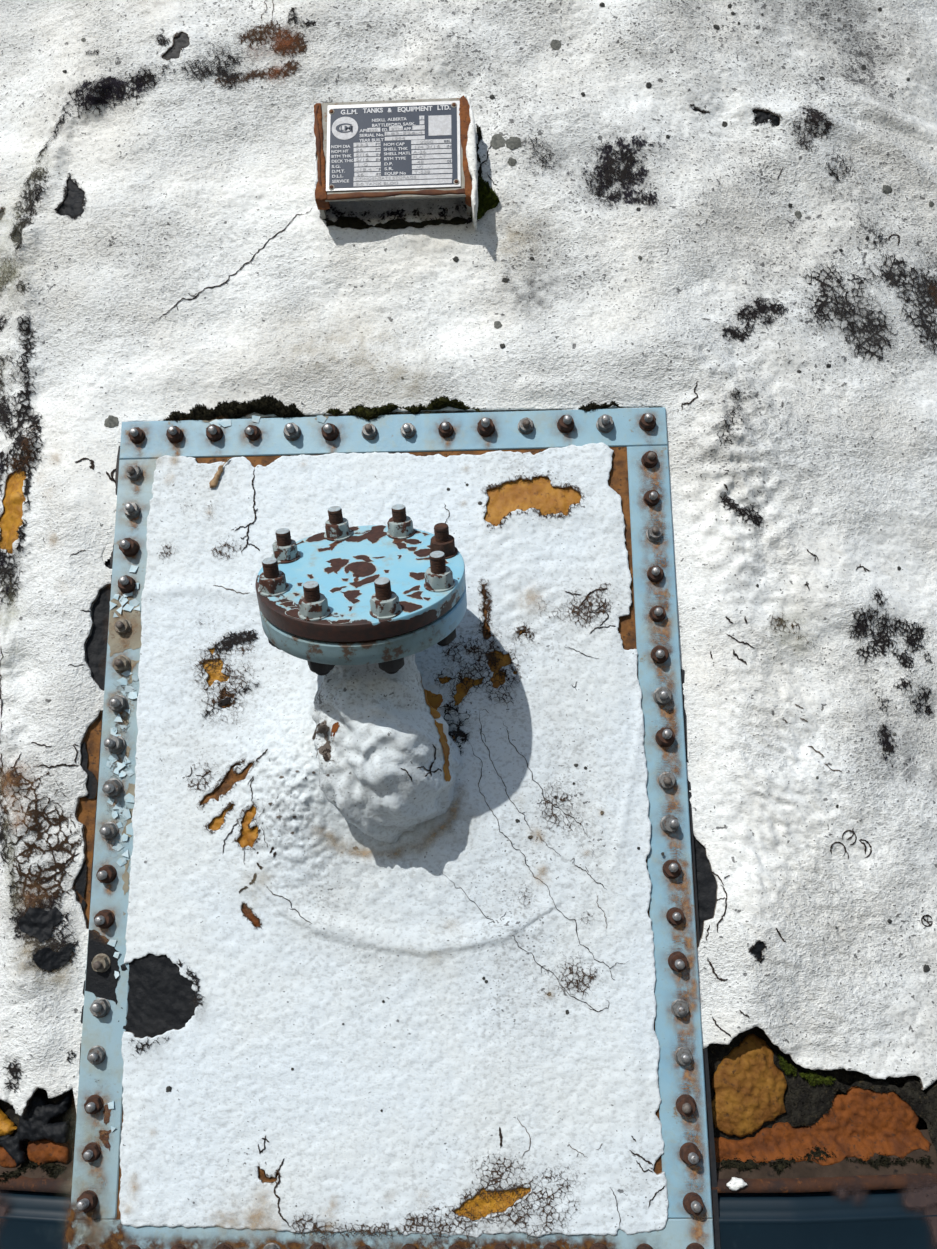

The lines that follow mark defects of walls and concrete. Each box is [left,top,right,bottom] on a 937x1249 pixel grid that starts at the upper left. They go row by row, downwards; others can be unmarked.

crack [0,0,316,607]
peeling [482,474,585,529]
peeling [279,720,339,779]
peeling [196,759,297,851]
peeling [19,907,198,1038]
rust [663,831,696,1093]
rust [65,1204,615,1249]
peeling [449,1178,536,1227]
rust [680,1158,702,1189]
rust [692,1210,707,1242]